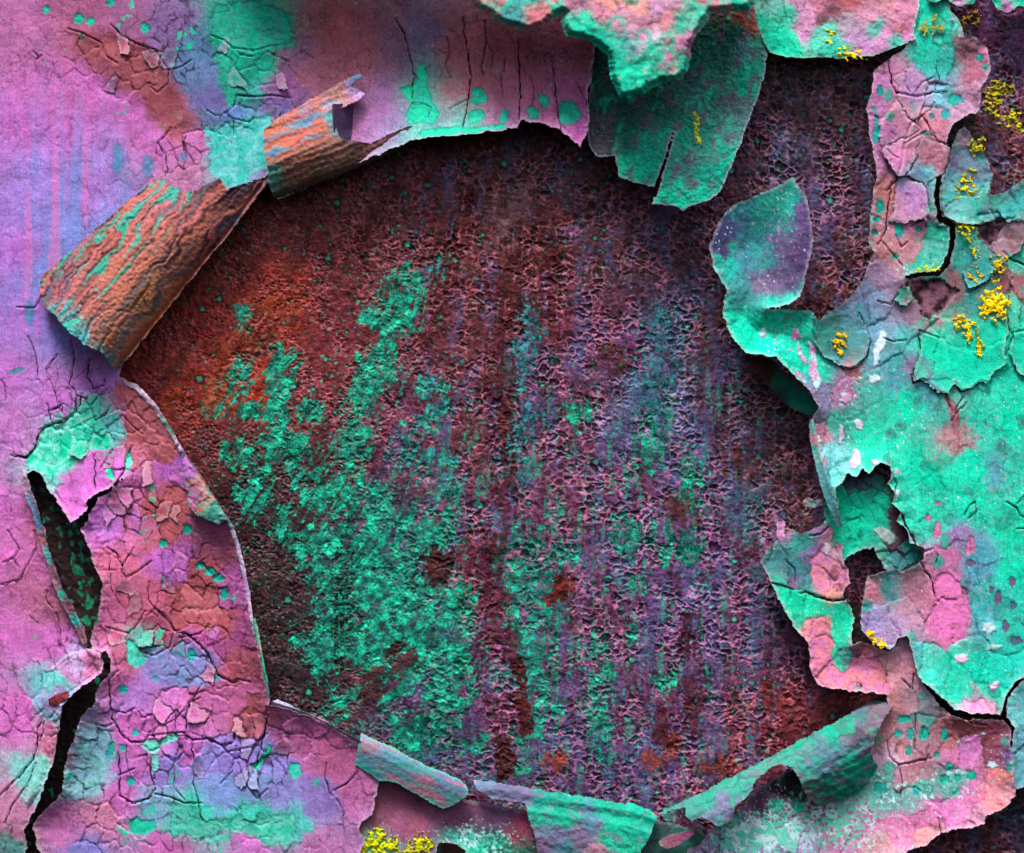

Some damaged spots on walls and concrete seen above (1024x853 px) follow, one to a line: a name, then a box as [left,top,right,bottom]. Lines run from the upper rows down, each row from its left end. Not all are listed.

peeling [39,174,269,369]
crack [396,18,587,134]
rust [419,200,567,781]
peeling [107,0,920,853]
crack [839,64,1005,420]
peeling [872,0,1024,288]
peeling [893,238,1024,438]
crack [968,257,1024,353]
crack [0,340,290,853]
rust [358,639,420,709]
rust [642,673,705,772]
rust [751,674,887,758]